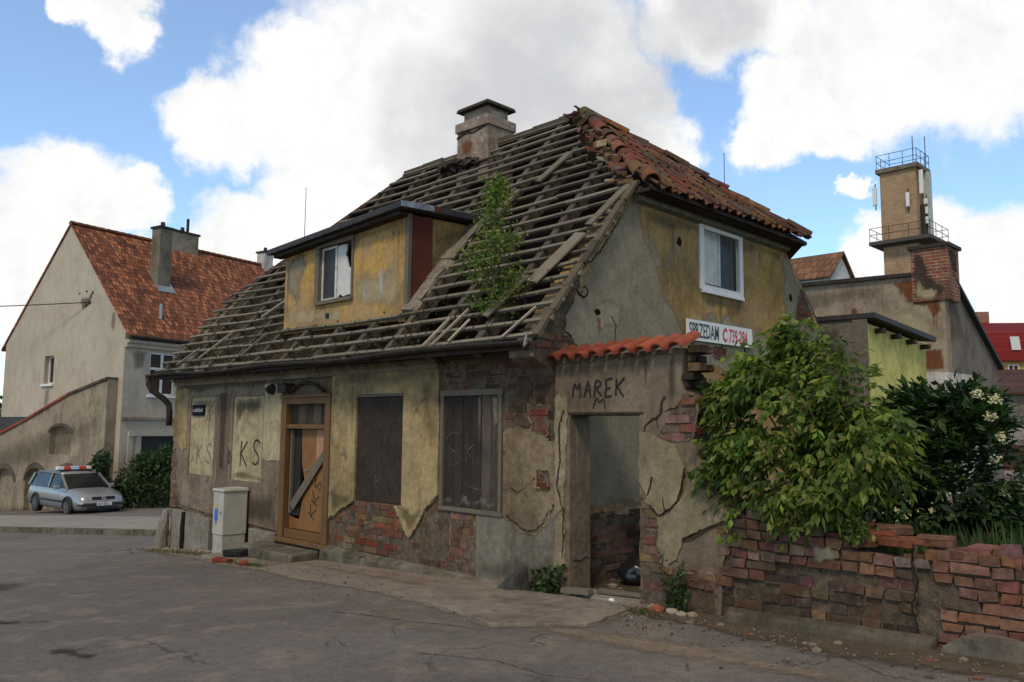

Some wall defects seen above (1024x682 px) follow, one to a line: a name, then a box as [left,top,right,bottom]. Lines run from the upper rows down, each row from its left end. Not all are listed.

peeling [893,313,943,370]
spalling [441,354,555,441]
crack [643,396,680,432]
spalling [333,497,489,572]
spalling [534,469,550,490]
crack [502,410,590,571]
peeling [590,416,717,615]
crack [650,468,686,517]